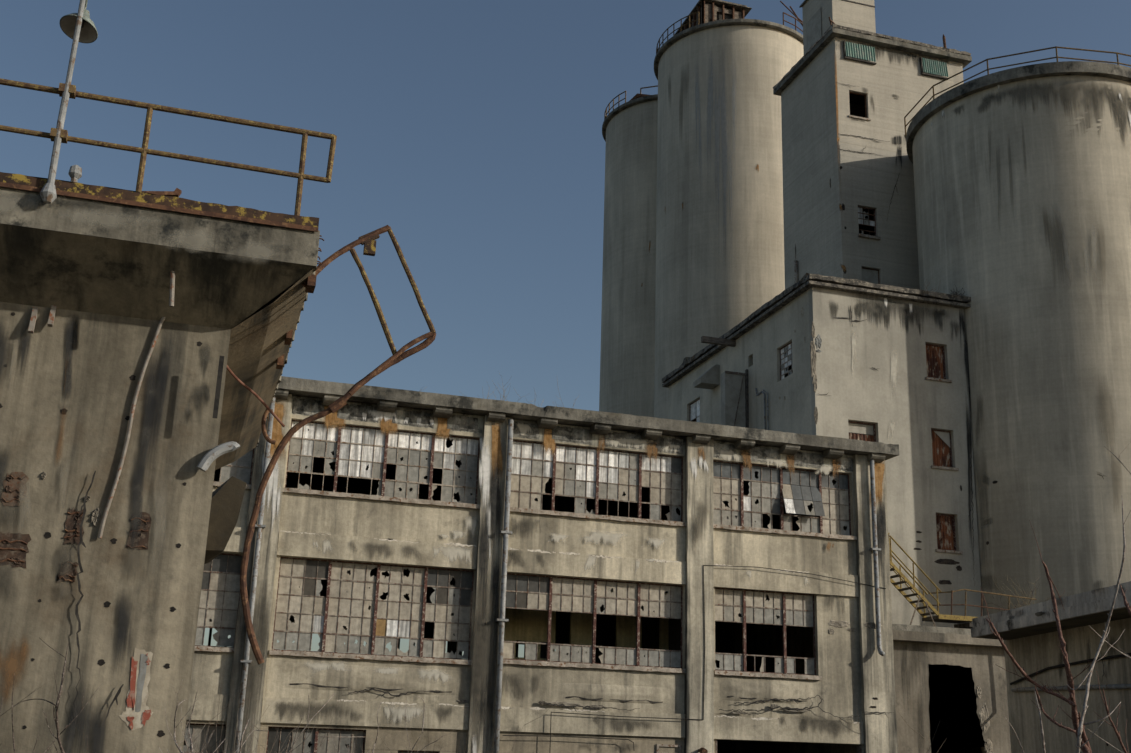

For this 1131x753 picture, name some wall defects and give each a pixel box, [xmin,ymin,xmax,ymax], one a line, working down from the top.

water stain [980,85,1131,132]
water stain [0,330,31,378]
water stain [65,320,78,397]
water stain [131,351,170,545]
water stain [855,294,972,532]
corrosion [0,472,31,591]
corrosion [57,507,84,597]
crack [73,471,124,725]
water stain [116,599,132,662]
corrosion [126,512,152,572]
water stain [434,438,539,753]
crack [719,695,893,723]